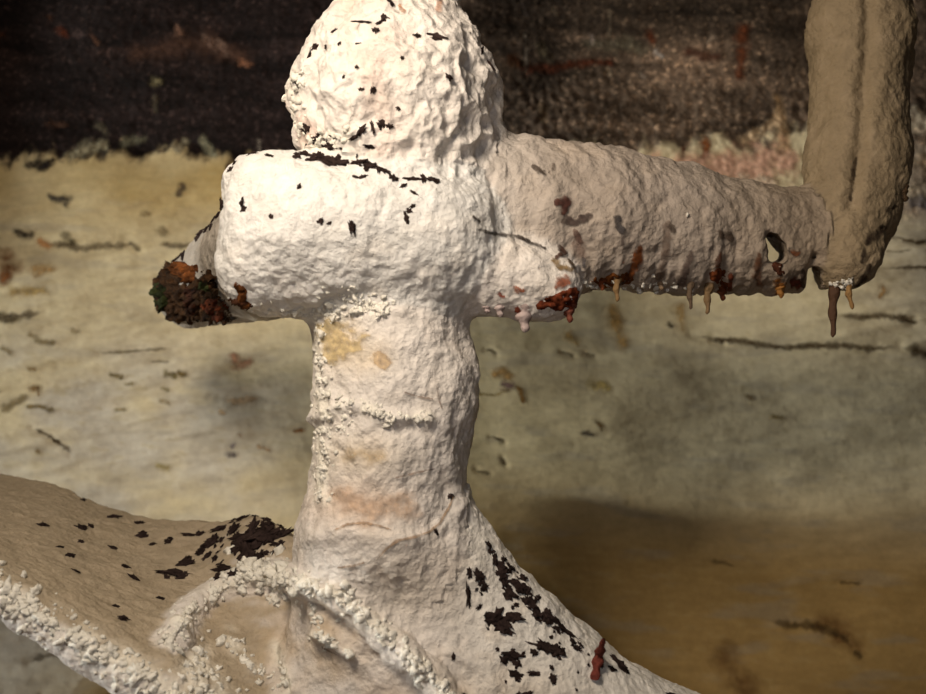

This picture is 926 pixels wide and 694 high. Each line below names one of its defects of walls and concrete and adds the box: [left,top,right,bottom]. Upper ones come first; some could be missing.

rust [718,230,734,242]
rust [148,261,253,328]
rust [536,258,580,317]
rust [591,245,642,288]
rust [675,251,693,286]
rust [709,252,734,294]
rust [752,253,762,286]
rust [772,262,806,296]